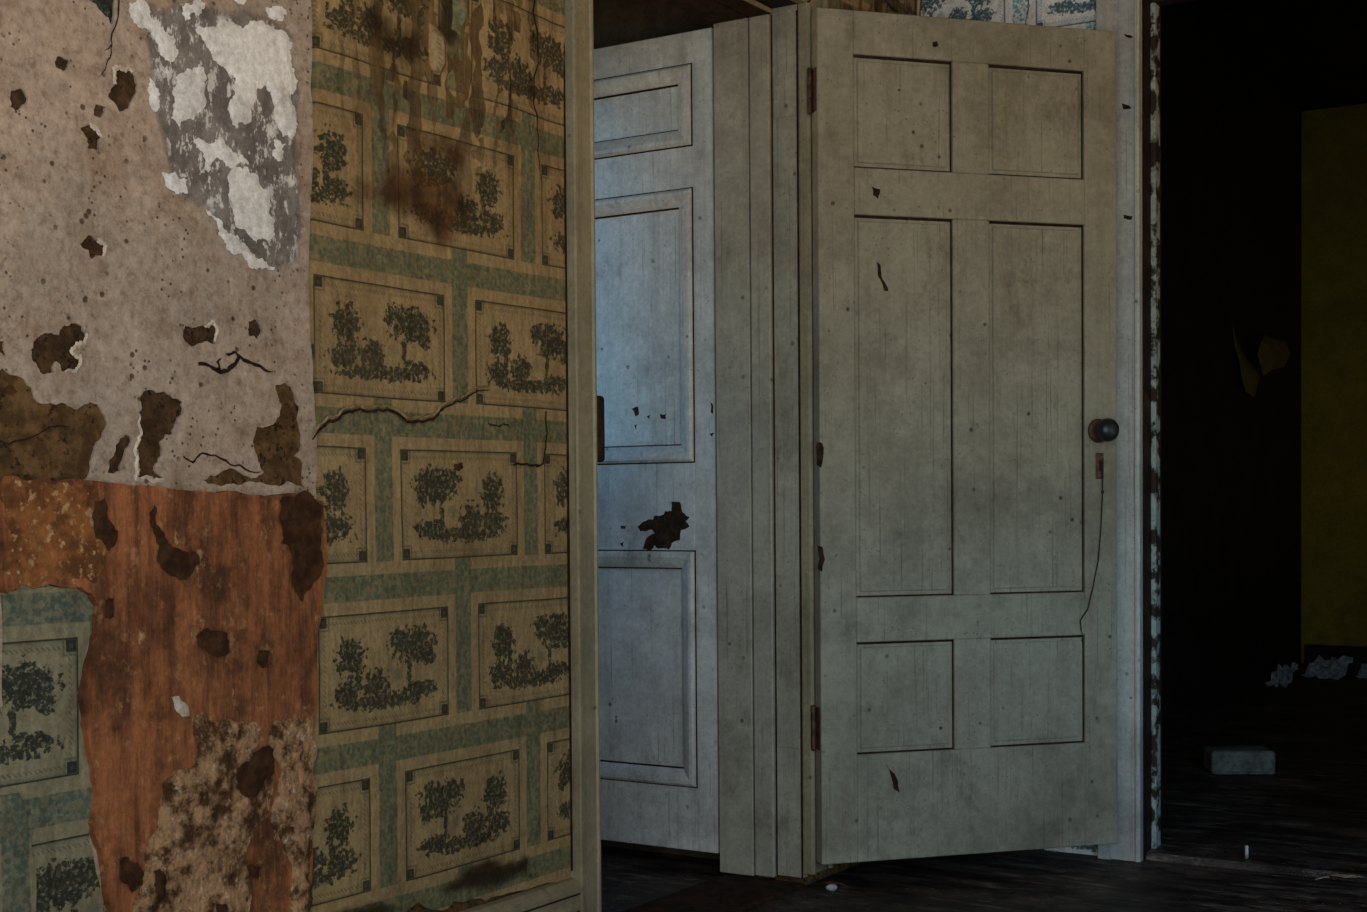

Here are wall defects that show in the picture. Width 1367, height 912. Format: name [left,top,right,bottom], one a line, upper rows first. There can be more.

damp [843,0,907,14]
damp [371,0,534,163]
peeling [80,0,302,270]
damp [380,175,464,239]
spalling [31,323,89,374]
crack [198,351,273,374]
spalling [0,342,106,481]
spalling [108,390,182,484]
spalling [204,383,303,487]
crack [311,385,510,440]
crack [513,411,548,467]